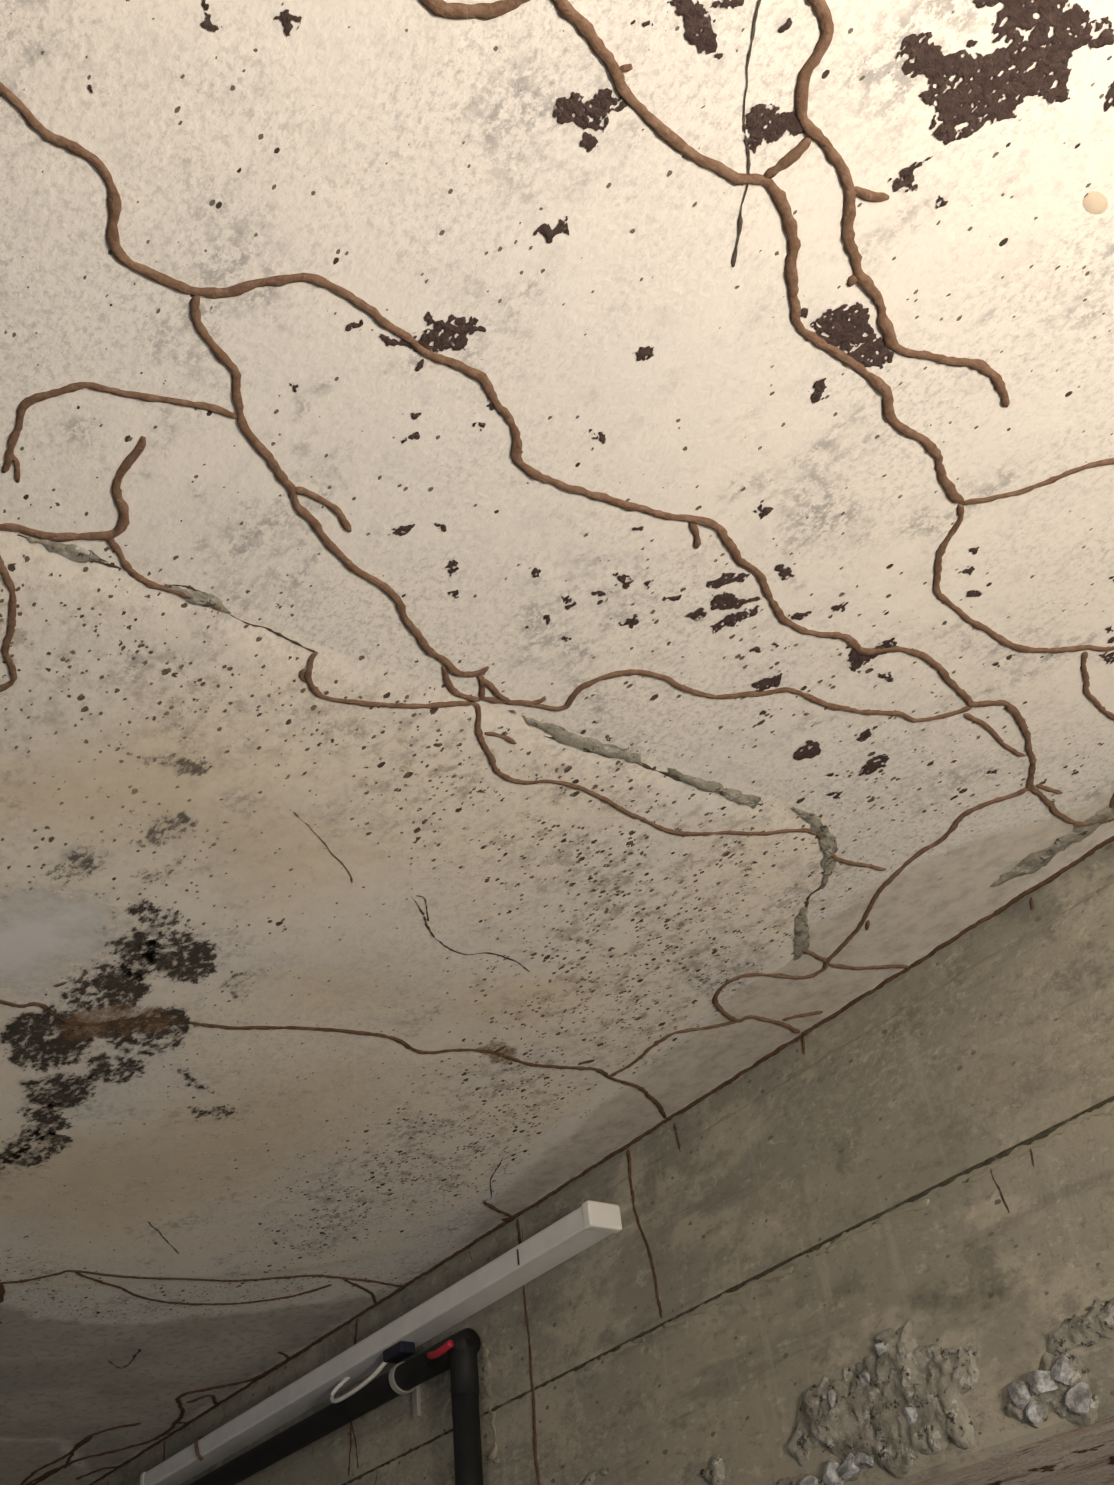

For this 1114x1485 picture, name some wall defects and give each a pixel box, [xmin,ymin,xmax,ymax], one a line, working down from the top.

crack [731,0,761,267]
crack [174,584,316,652]
peeling [752,673,782,692]
leakage [147,753,213,776]
crack [637,762,681,781]
peeling [793,740,822,761]
peeling [859,754,890,776]
leakage [139,812,196,847]
crack [411,895,530,972]
leakage [0,840,249,1170]
spalling [1005,1297,1114,1429]
spalling [777,1320,980,1485]